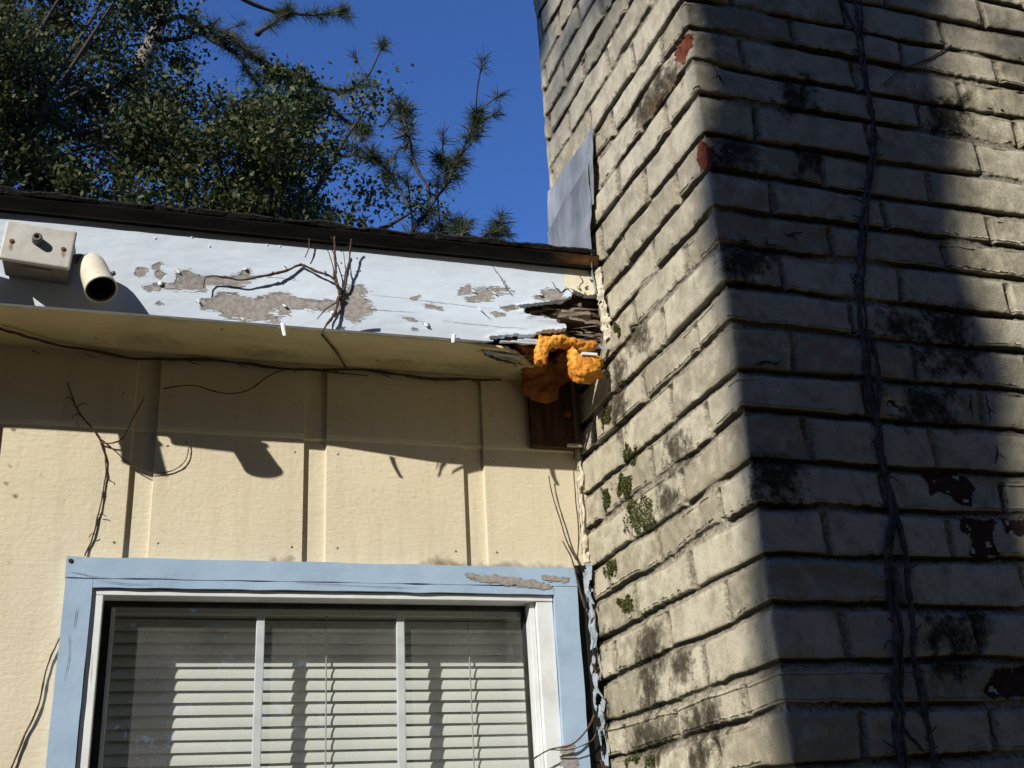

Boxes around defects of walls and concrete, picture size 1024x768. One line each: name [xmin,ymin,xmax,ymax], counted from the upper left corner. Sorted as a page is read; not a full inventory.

peeling [134,262,377,336]
peeling [457,283,519,317]
peeling [920,468,1024,560]
peeling [464,573,569,590]
peeling [984,665,1024,700]